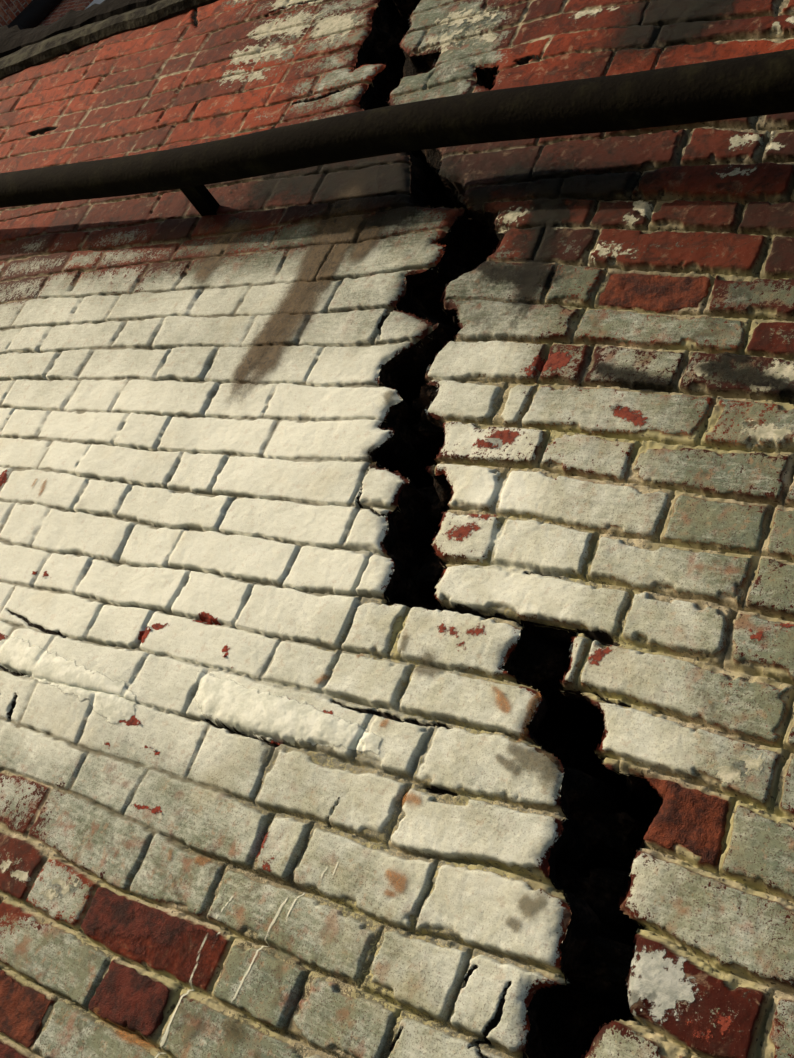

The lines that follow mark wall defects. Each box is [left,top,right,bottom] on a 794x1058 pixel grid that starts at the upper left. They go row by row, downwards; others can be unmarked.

crack [292,0,441,110]
crack [517,55,541,65]
water stain [594,0,737,71]
spalling [599,273,711,313]
peeling [520,351,574,383]
peeling [603,405,648,427]
crack [356,148,663,1058]
peeling [588,645,612,666]
crack [331,700,452,729]
spalling [639,776,729,866]
spalling [81,887,223,1036]
spalling [0,970,51,1058]